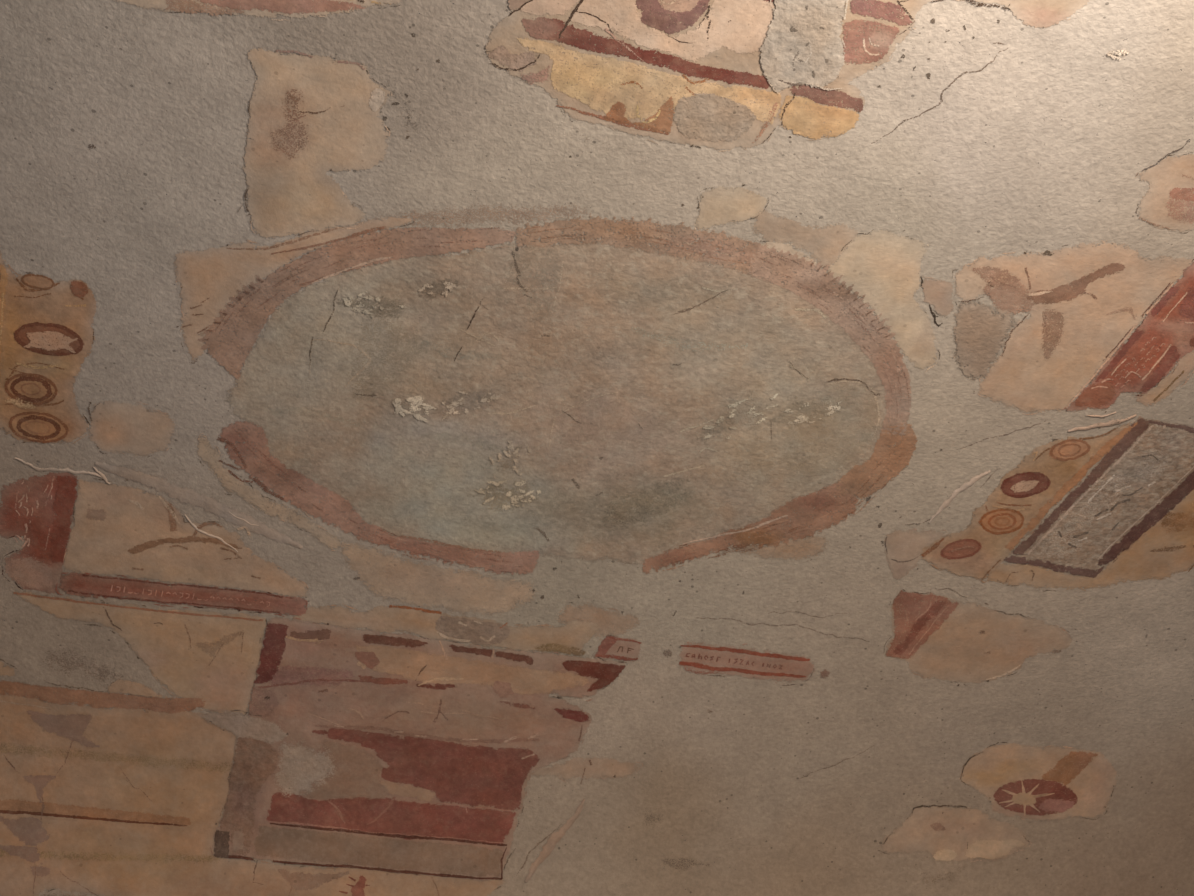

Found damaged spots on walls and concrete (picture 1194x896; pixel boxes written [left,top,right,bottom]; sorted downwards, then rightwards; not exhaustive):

crack [486,0,613,71]
crack [897,0,1010,34]
crack [871,42,1008,144]